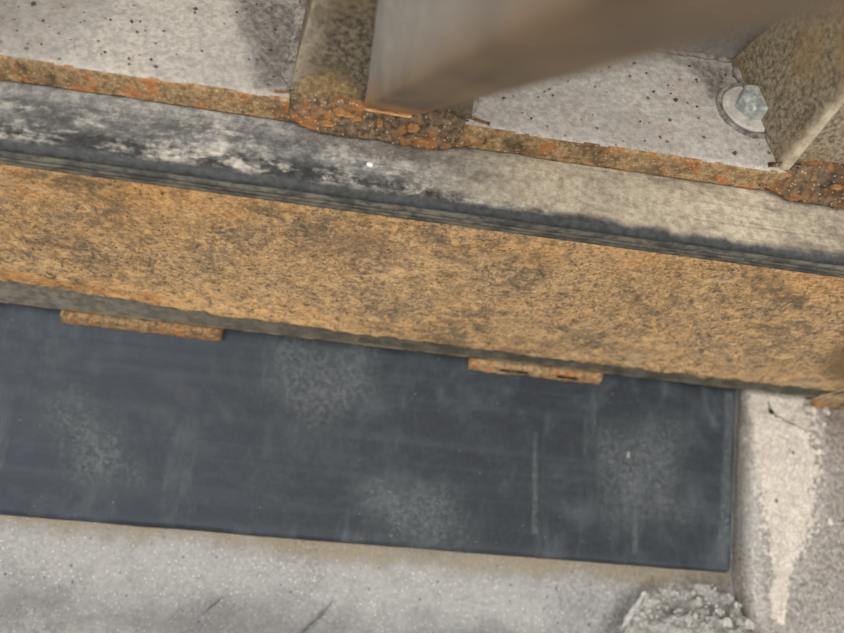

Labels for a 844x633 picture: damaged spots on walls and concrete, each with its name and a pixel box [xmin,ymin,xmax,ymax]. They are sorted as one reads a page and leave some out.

rust [273,79,490,150]
rust [759,159,844,209]
spalling [622,581,755,633]